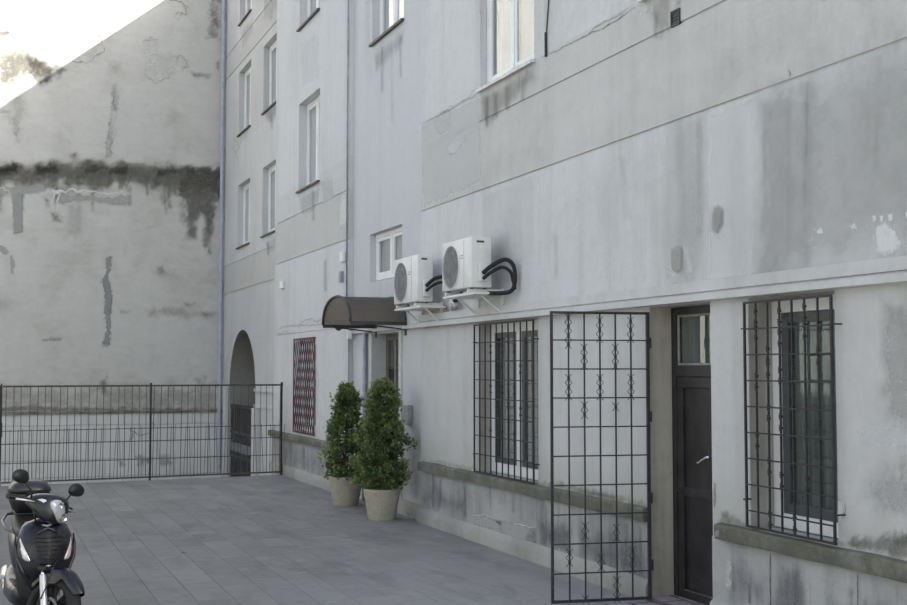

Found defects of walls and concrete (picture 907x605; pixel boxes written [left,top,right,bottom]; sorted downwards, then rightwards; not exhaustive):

water stain [0,53,52,84]
water stain [0,154,220,240]
water stain [772,75,907,245]
peeling [872,214,901,253]